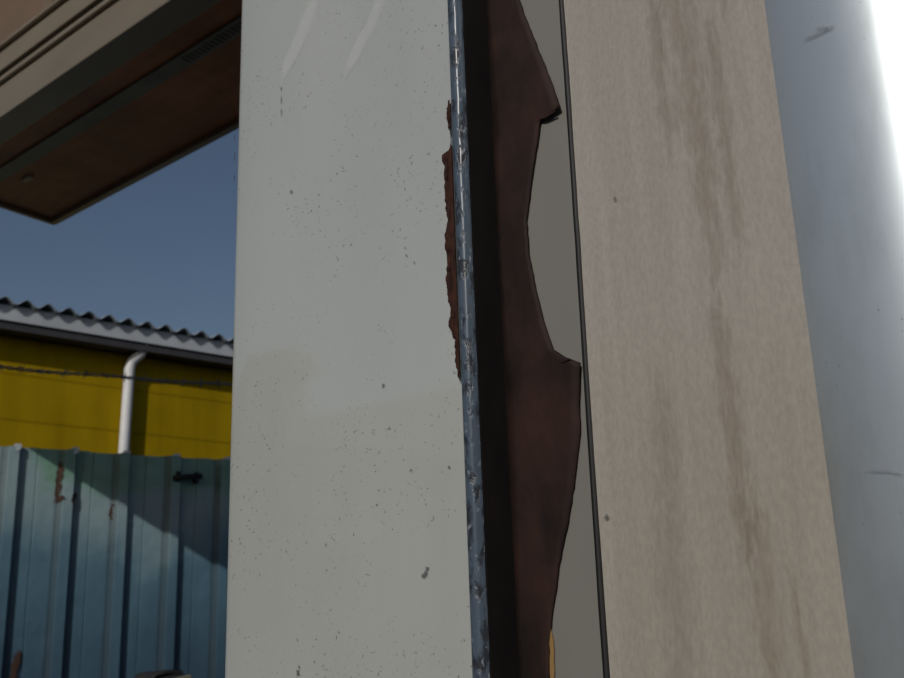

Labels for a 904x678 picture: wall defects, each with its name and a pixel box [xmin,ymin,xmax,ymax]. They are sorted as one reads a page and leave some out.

rust [54,462,77,503]